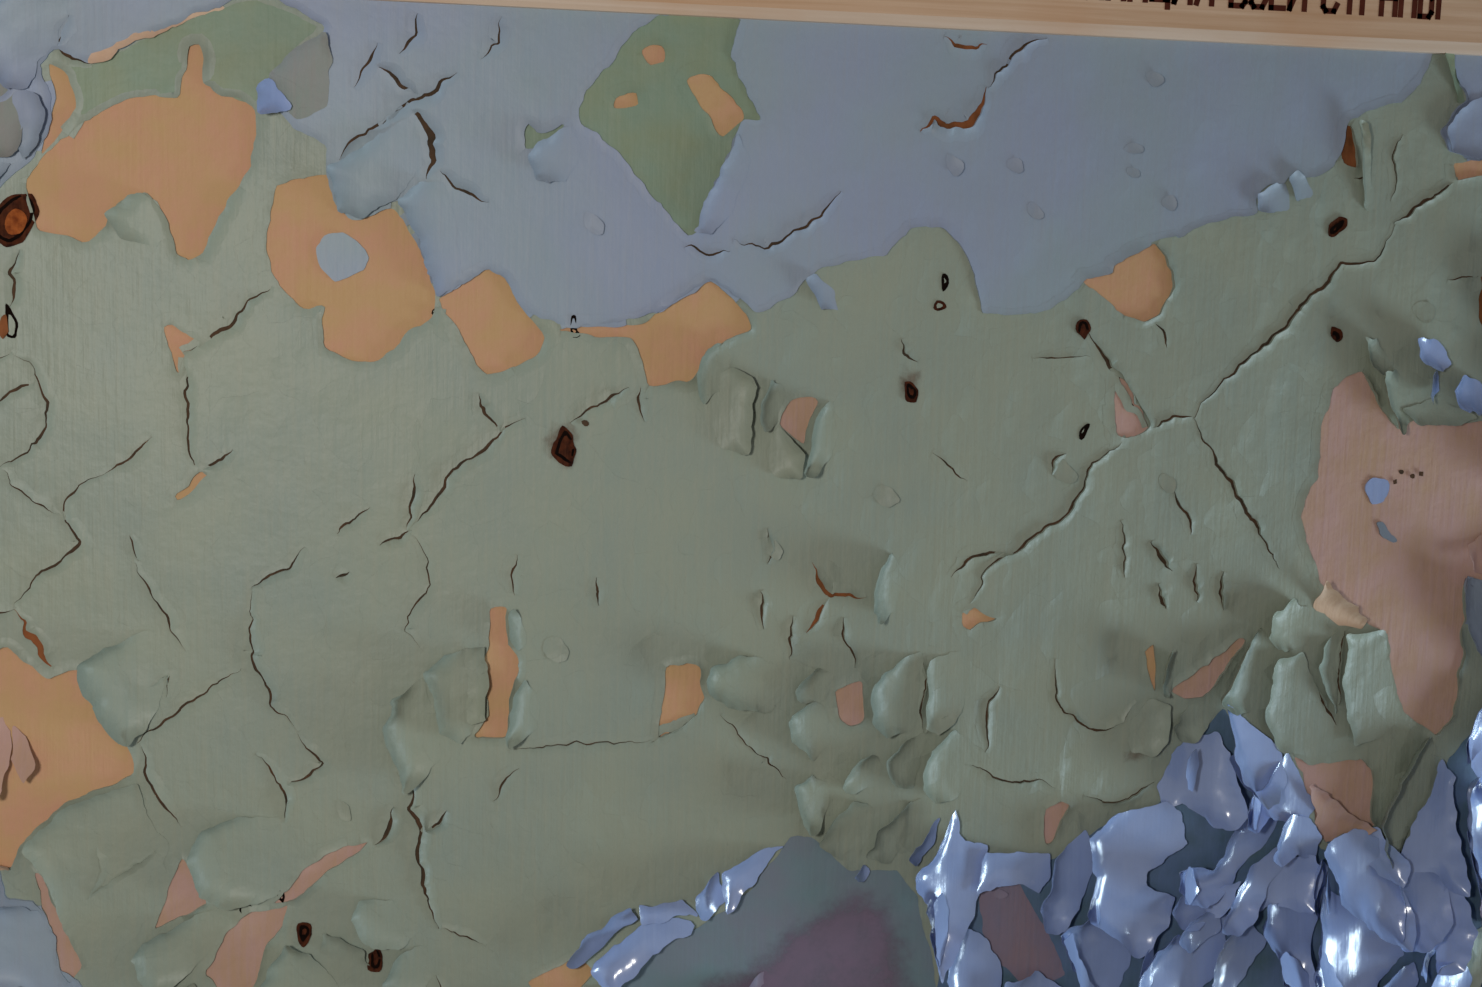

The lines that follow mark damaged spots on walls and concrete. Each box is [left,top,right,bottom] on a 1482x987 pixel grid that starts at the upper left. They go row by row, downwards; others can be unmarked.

peeling [0,0,838,480]
crack [683,188,846,265]
crack [915,32,1050,143]
peeling [1330,119,1362,177]
crack [947,133,1458,614]
peeling [0,630,435,987]
crack [0,285,527,829]
crack [375,772,488,987]
peeling [522,846,783,987]
crack [751,528,869,668]
crack [916,653,1156,810]
peeling [794,336,1482,987]